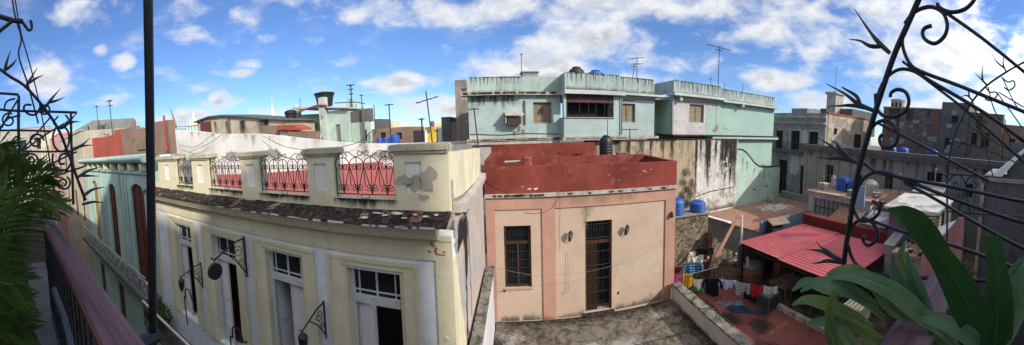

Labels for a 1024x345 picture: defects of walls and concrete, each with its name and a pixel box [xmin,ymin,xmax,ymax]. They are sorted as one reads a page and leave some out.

peeling [395,165,438,201]
damp [616,141,682,156]
damp [678,140,748,209]
peeling [360,181,458,256]